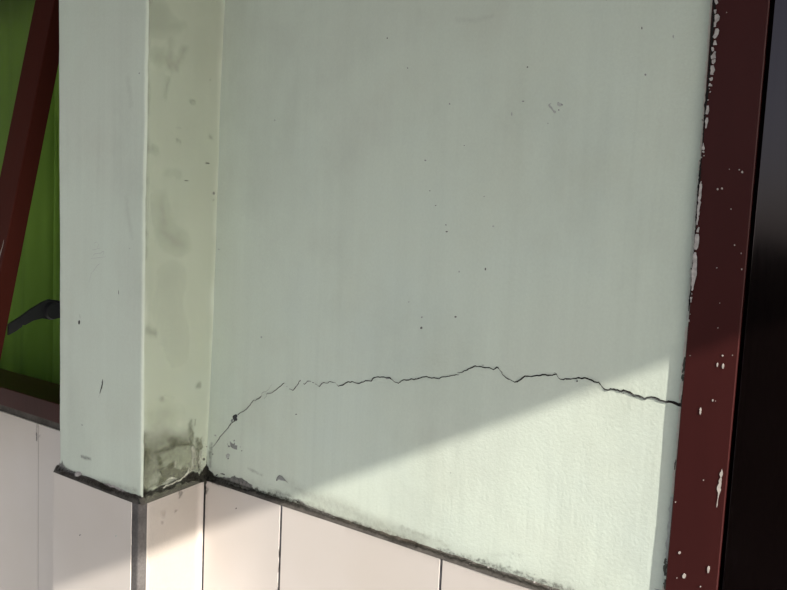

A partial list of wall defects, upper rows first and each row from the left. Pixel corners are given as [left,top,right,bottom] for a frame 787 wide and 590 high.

peeling [662,0,720,590]
crack [216,365,681,443]
leakage [56,419,548,590]